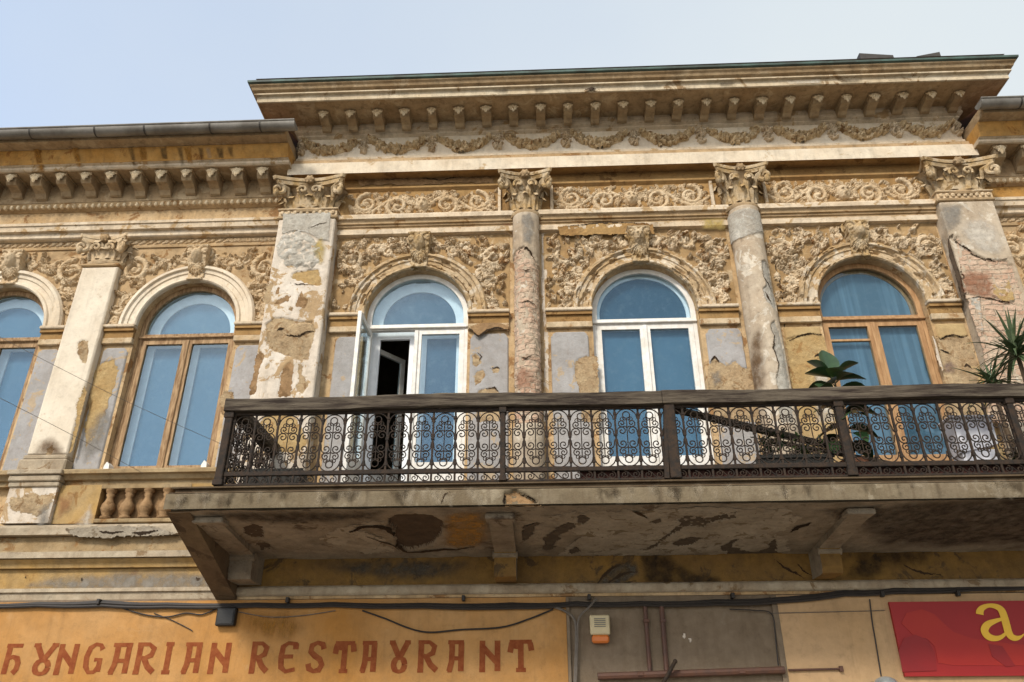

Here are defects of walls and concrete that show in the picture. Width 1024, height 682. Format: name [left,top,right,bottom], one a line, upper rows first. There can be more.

crack [952,234,1007,262]
flaking render [467,223,654,393]
flaking render [932,206,1024,384]
crack [967,296,1013,304]
spalling [249,269,322,397]
spalling [69,340,119,458]
peeling [476,412,500,422]
peeling [581,410,601,422]
spalling [944,402,1024,423]
peeling [9,492,53,524]
spalling [65,525,175,538]
spalling [350,513,473,553]